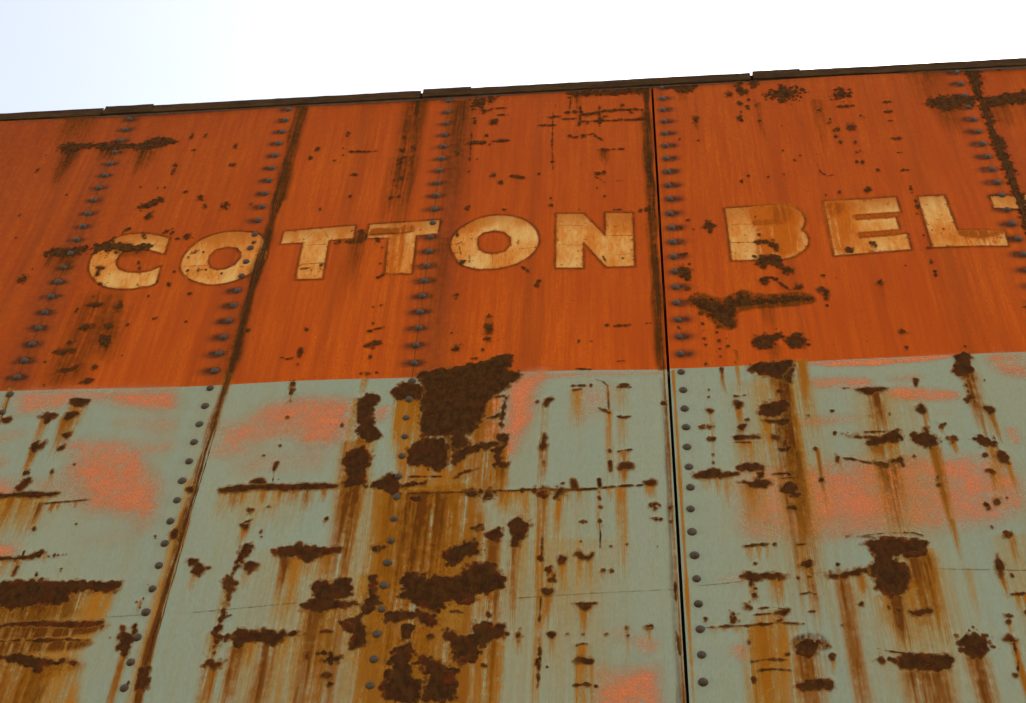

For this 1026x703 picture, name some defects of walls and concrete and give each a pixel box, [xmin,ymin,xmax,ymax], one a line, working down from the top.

corrosion [818,87,865,164]
corrosion [958,230,1005,242]
corrosion [0,104,307,703]
corrosion [833,387,959,547]
corrosion [951,345,1016,510]
corrosion [877,525,1026,703]